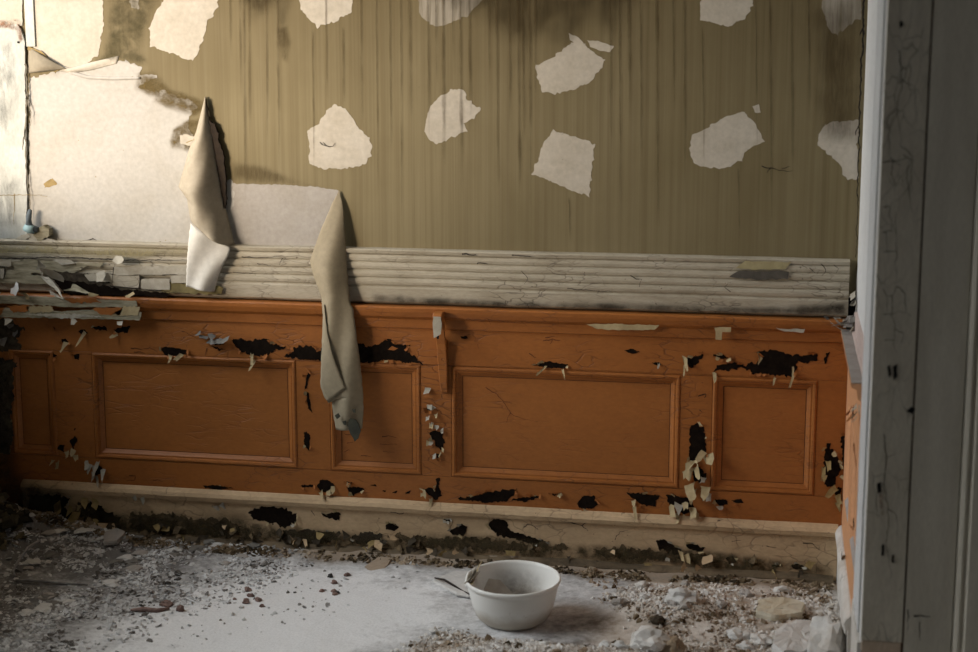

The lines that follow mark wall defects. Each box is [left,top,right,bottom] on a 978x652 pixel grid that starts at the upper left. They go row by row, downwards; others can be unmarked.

peeling [148,0,218,61]
peeling [299,0,353,29]
peeling [535,33,614,95]
peeling [28,0,201,243]
peeling [307,104,372,170]
peeling [424,89,481,144]
peeling [531,129,595,197]
peeling [689,104,765,169]
peeling [0,256,223,455]
peeling [682,349,830,388]
peeling [626,422,744,524]
peeling [31,494,571,563]